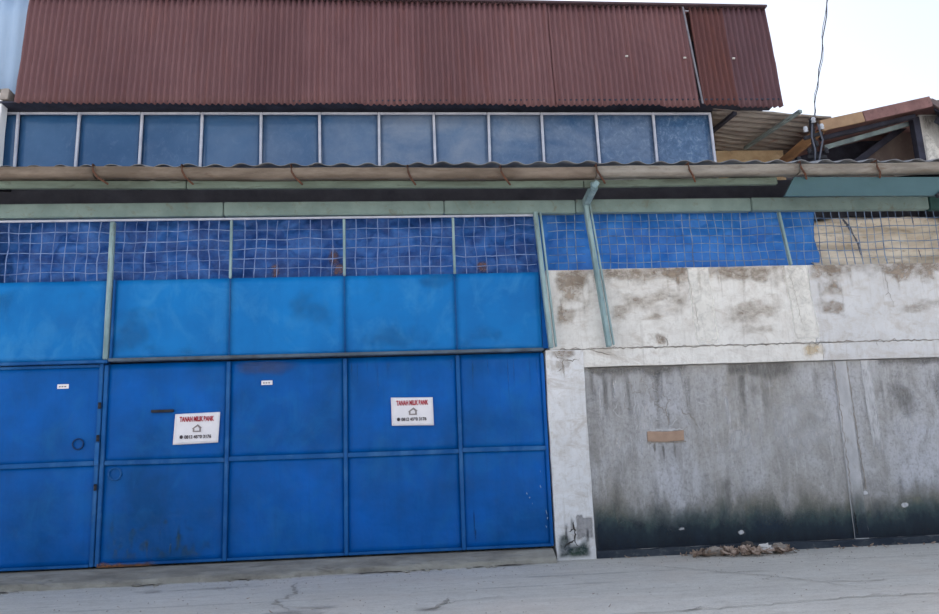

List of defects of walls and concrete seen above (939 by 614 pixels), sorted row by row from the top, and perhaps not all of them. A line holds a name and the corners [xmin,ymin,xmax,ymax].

leakage [630,267,686,283]
leakage [814,264,853,288]
leakage [885,263,932,280]
leakage [729,362,787,376]
leakage [589,365,711,448]
leakage [860,360,881,445]
leakage [595,492,939,550]